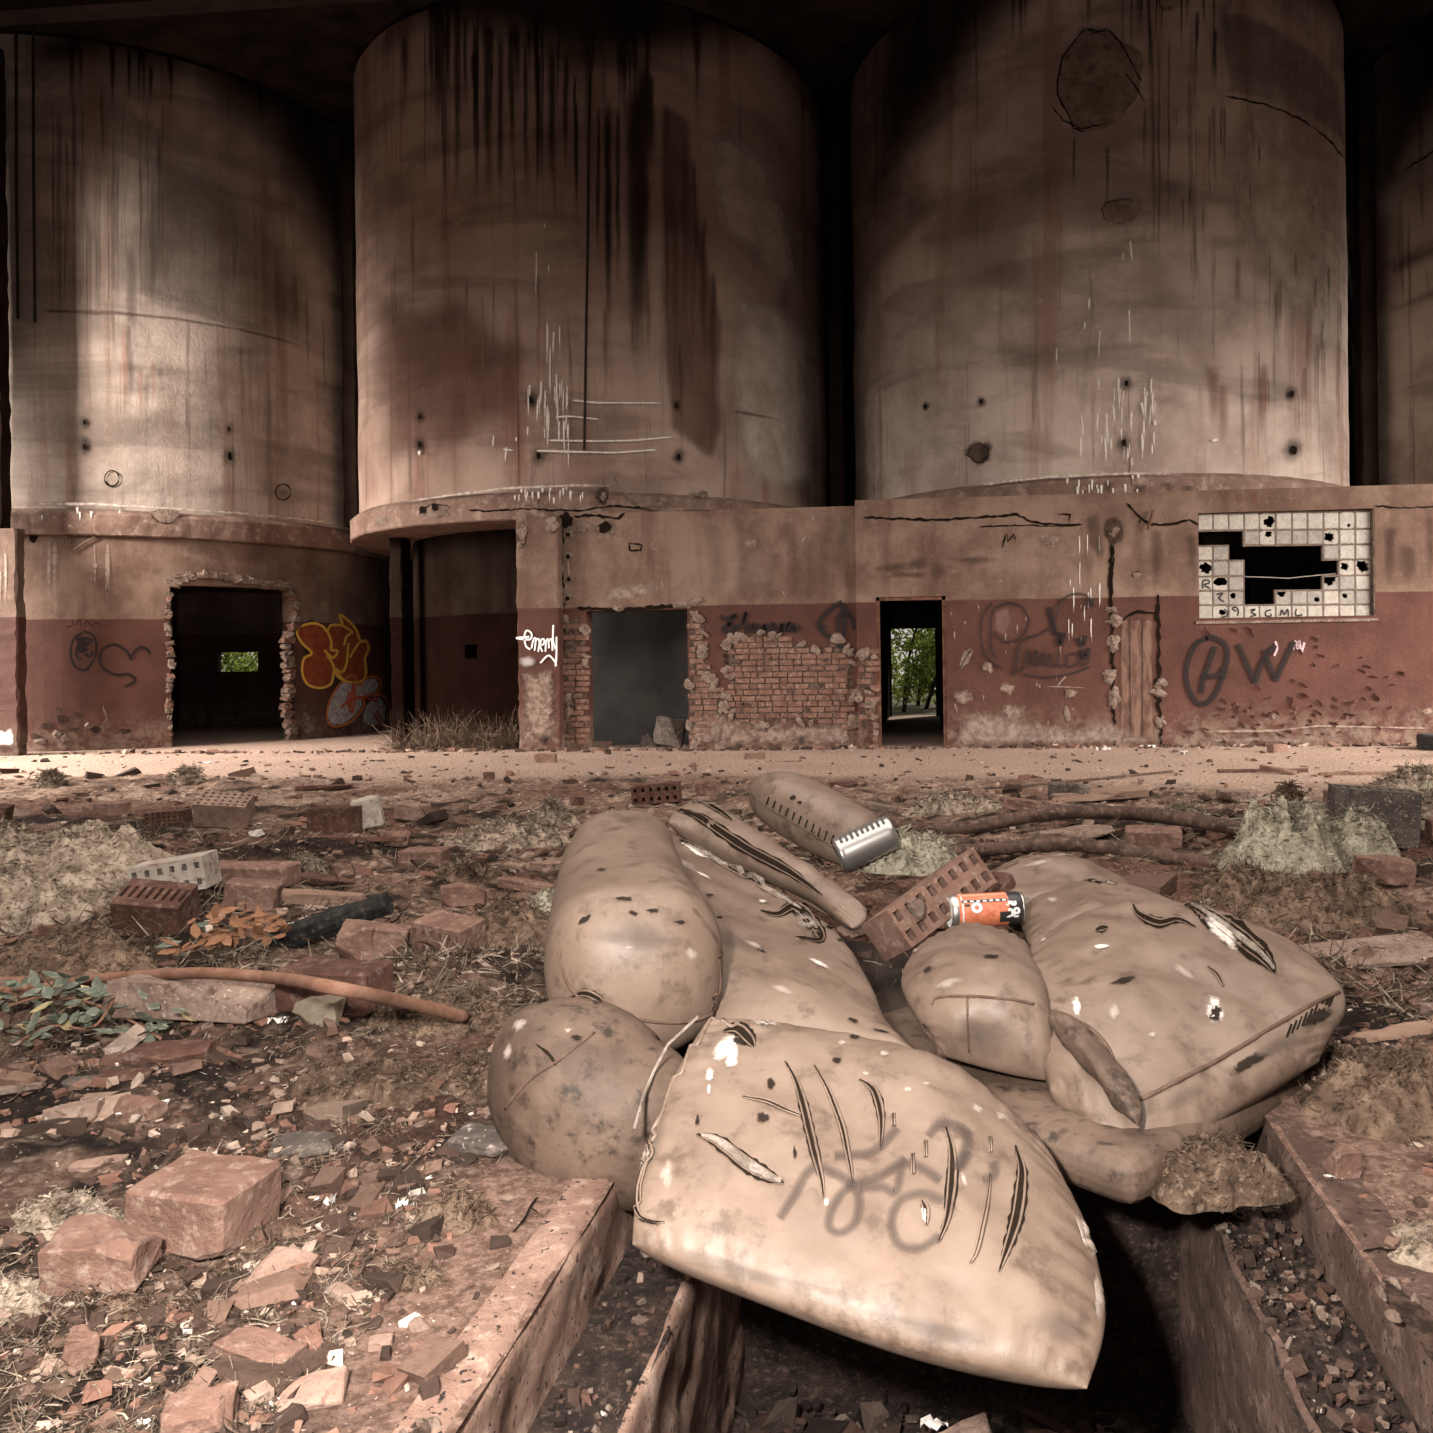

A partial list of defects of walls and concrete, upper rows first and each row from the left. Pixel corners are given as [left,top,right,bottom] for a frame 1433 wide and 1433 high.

damp [424,0,578,183]
spalling [1051,28,1145,132]
damp [596,73,654,304]
crack [864,513,1082,527]
crack [1127,503,1199,526]
flaking render [672,596,880,749]
crack [1102,544,1168,746]